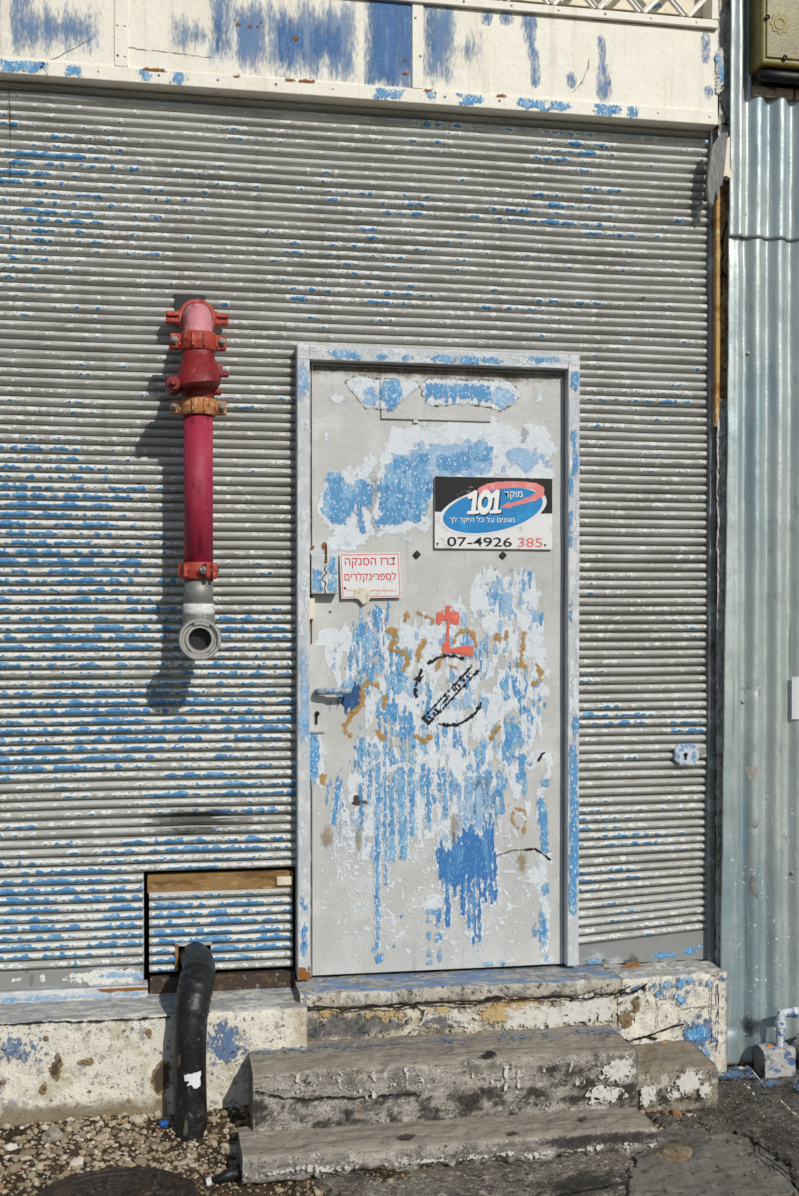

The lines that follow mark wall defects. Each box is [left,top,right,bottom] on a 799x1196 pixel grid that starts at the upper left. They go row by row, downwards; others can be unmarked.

peeling [0,59,48,75]
peeling [64,65,82,78]
peeling [169,72,188,85]
peeling [372,88,405,100]
peeling [0,93,732,1058]
crack [307,983,719,1051]
peeling [206,1017,251,1069]
peeling [0,1028,103,1095]
spalling [151,1060,171,1095]
crack [255,1090,421,1101]